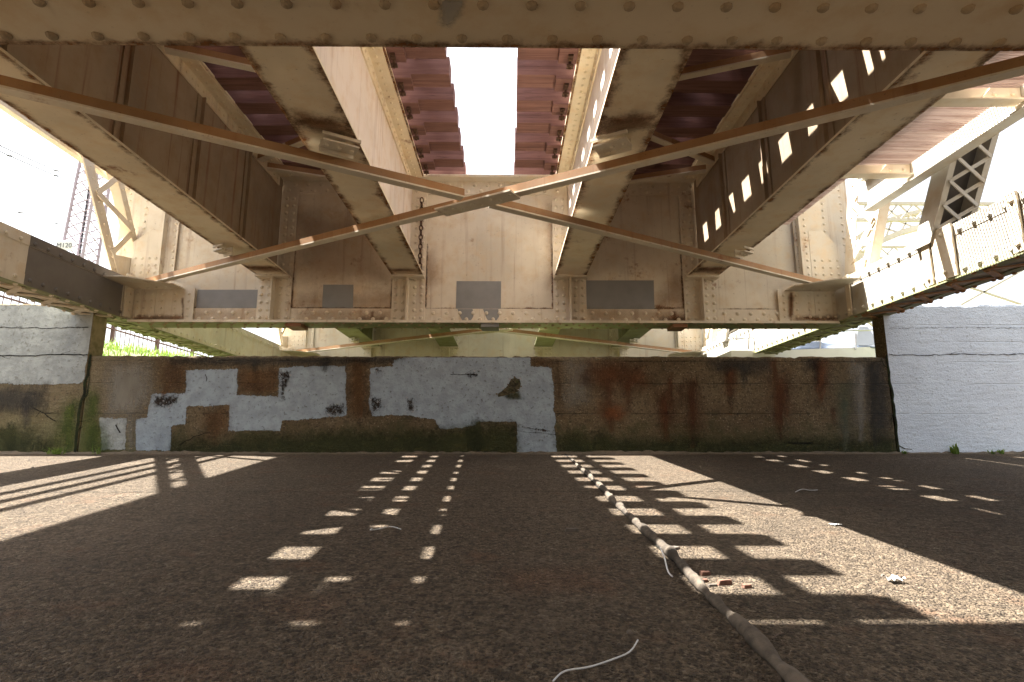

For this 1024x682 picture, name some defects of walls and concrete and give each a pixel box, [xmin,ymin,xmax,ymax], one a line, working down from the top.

corrosion [108,40,367,162]
corrosion [353,40,808,176]
corrosion [831,45,1024,89]
corrosion [506,181,585,309]
crack [0,324,121,452]
peeling [152,395,180,409]
peeling [276,370,291,400]
peeling [325,403,345,416]